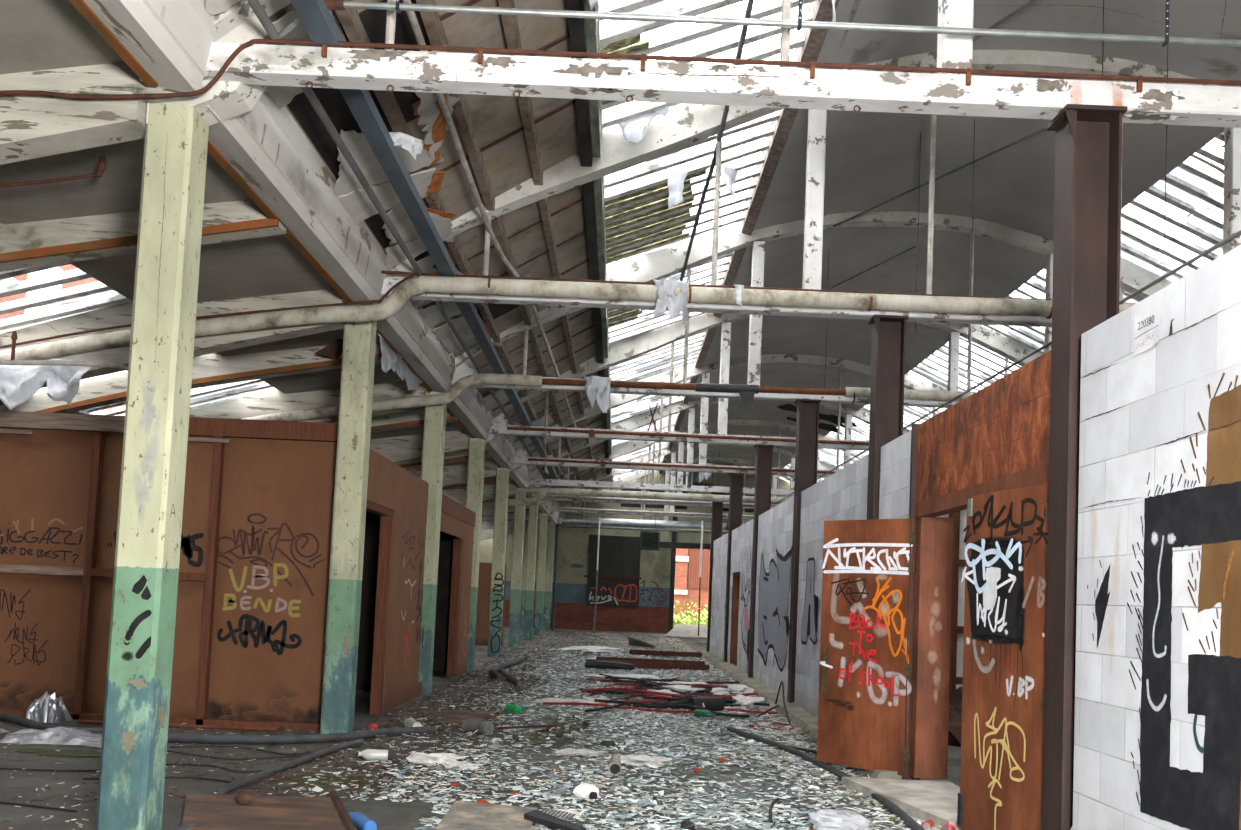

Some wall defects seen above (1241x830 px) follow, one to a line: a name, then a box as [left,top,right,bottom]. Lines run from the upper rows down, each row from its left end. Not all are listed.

peeling [348,49,410,64]
peeling [469,54,526,68]
peeling [553,60,631,94]
peeling [706,64,771,75]
peeling [1026,79,1073,93]
peeling [1122,87,1185,121]